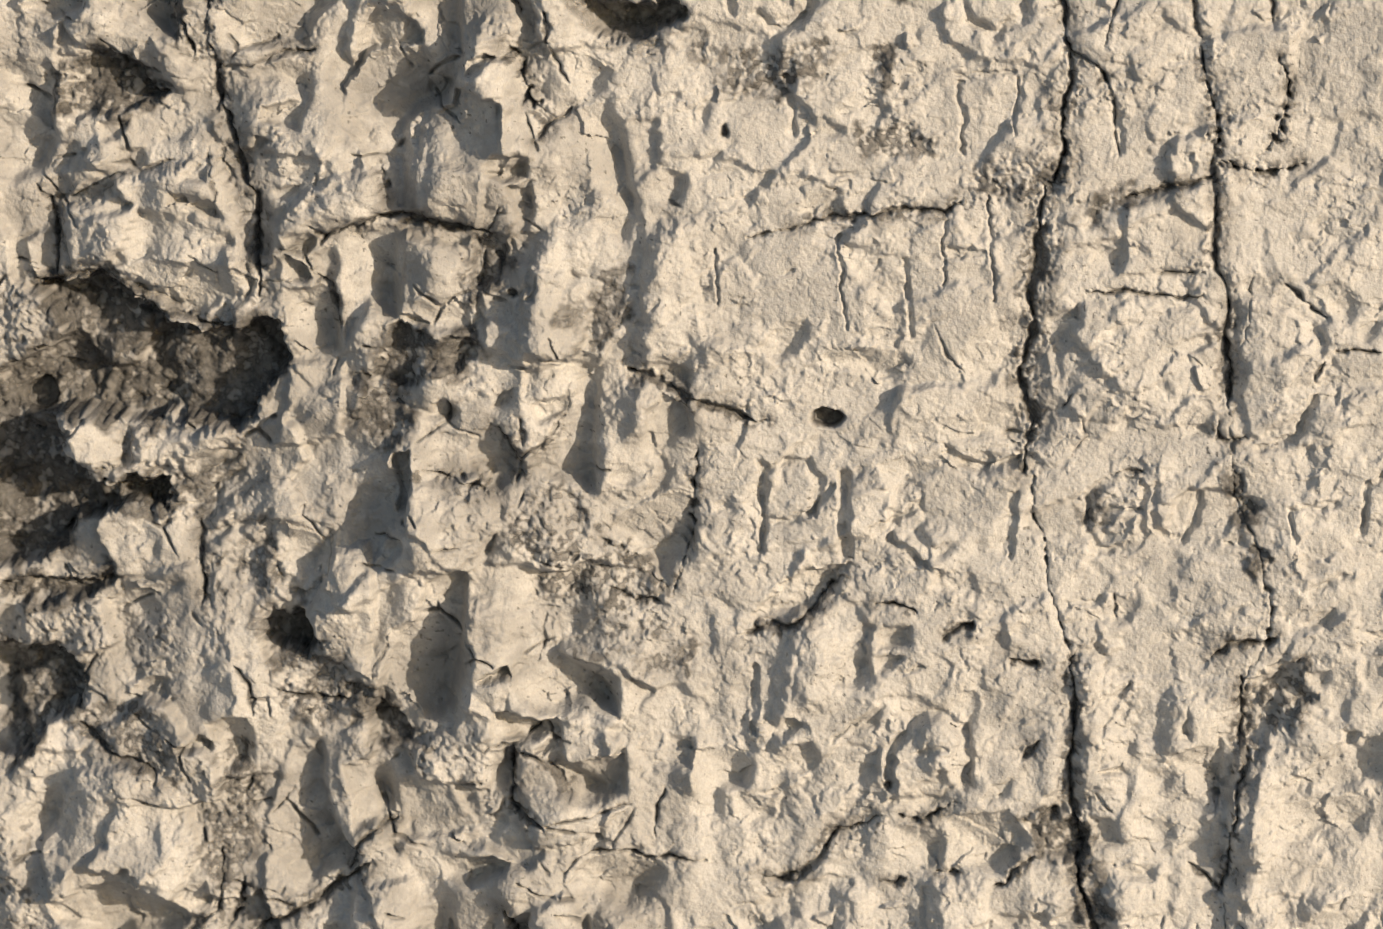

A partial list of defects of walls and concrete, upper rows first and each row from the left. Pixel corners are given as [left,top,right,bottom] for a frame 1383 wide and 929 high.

crack [39,0,496,330]
crack [761,199,967,234]
crack [1102,0,1309,444]
crack [1192,586,1280,891]